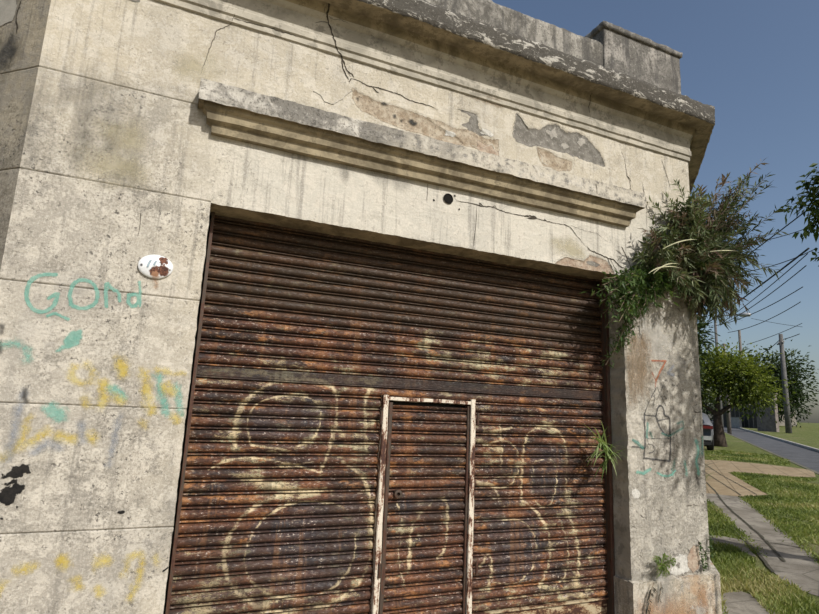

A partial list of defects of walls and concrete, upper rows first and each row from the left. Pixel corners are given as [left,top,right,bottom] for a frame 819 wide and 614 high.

damp [0,36,17,66]
crack [201,15,298,73]
crack [316,3,438,110]
spalling [313,88,500,156]
spalling [512,113,605,171]
crack [456,200,630,274]
spalling [552,245,614,274]